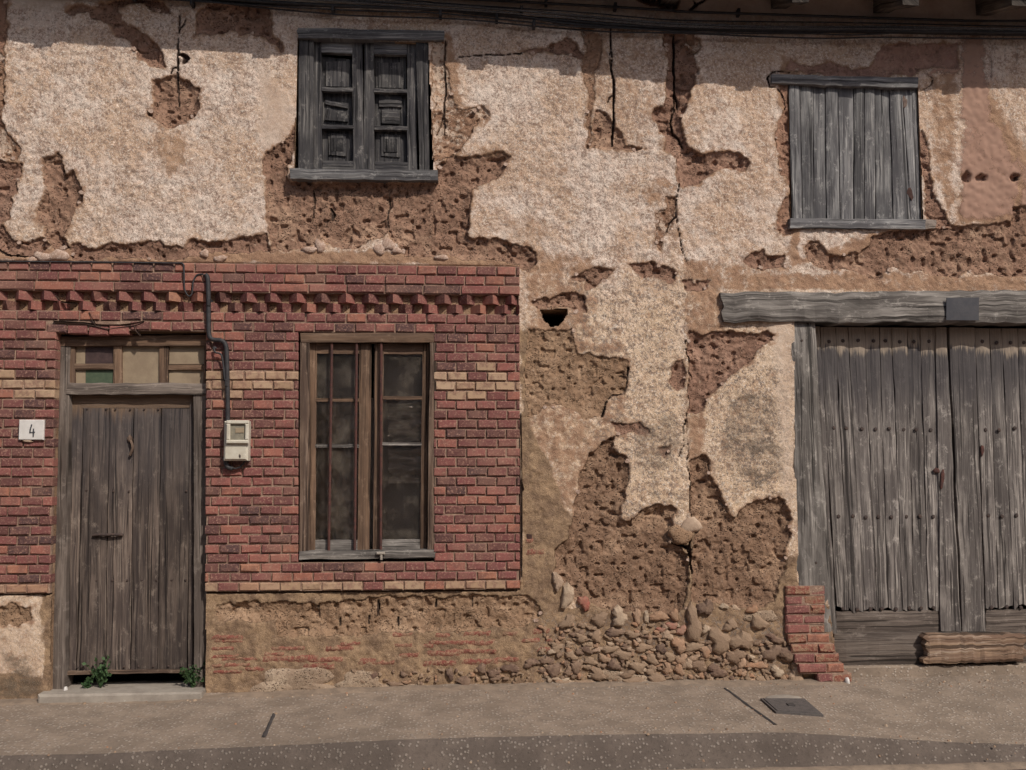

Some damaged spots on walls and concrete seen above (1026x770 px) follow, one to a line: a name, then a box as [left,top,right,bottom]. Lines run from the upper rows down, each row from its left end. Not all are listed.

crack [170,10,190,106]
spalling [0,0,537,272]
crack [607,29,615,146]
crack [669,34,683,149]
spalling [652,34,750,250]
spalling [785,36,1026,281]
spalling [630,262,710,291]
crack [666,183,688,264]
spalling [523,329,628,419]
spalling [669,330,776,414]
crack [672,339,693,574]
spalling [525,422,792,614]